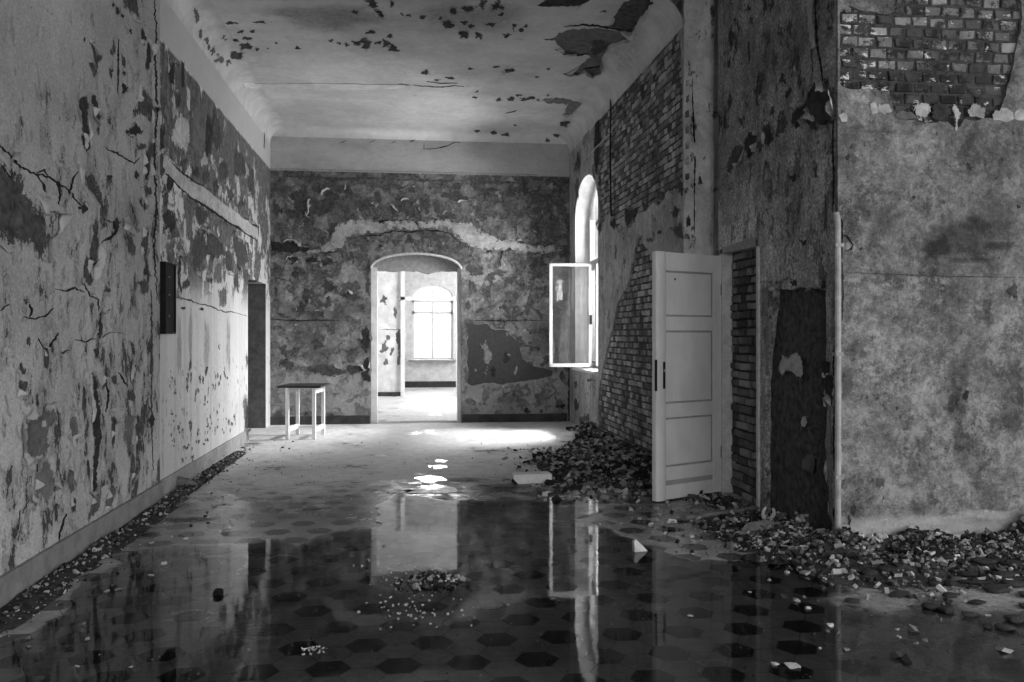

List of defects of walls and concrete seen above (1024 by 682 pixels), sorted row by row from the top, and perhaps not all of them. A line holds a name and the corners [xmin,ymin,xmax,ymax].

peeling [193,8,278,66]
peeling [545,0,654,79]
spalling [840,0,1021,127]
peeling [0,92,111,294]
crack [0,283,119,369]
crack [0,145,121,243]
crack [106,0,259,470]
peeling [122,61,254,307]
crack [316,219,479,254]
spalling [270,34,689,453]
peeling [17,335,155,521]
peeling [822,345,835,522]